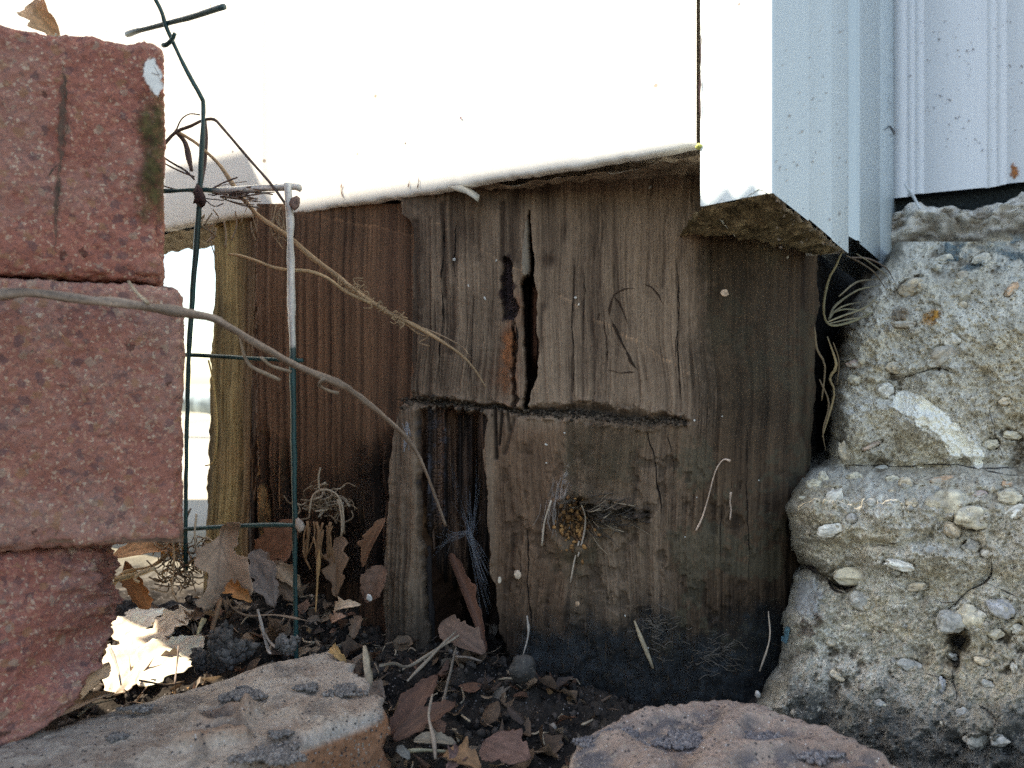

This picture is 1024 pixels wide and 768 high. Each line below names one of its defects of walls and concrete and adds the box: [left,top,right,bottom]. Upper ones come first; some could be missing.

crack [511,238,538,395]
crack [840,408,1023,476]
damp [518,604,783,707]